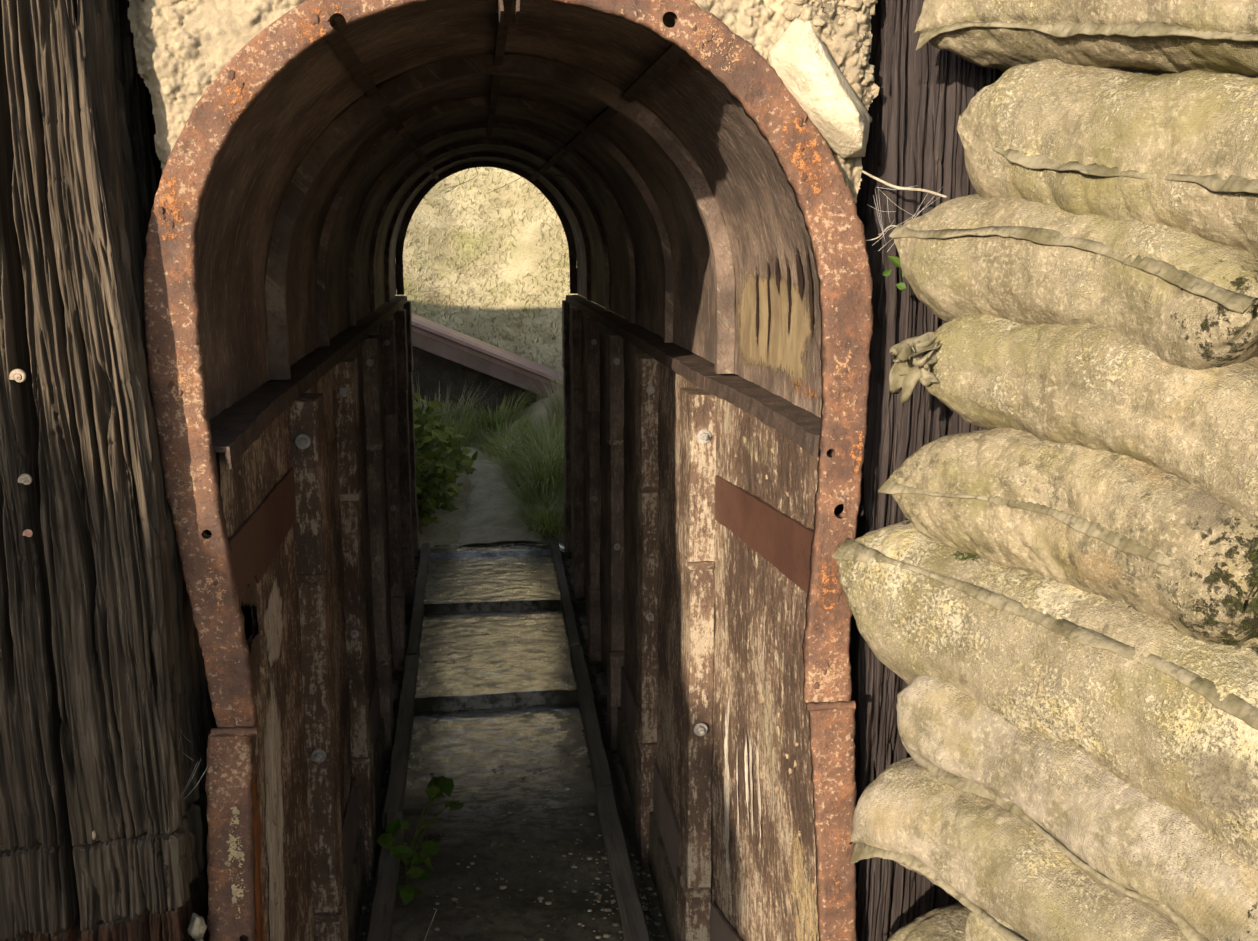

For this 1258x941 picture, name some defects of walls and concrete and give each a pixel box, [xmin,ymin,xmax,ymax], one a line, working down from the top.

corrosion [295,4,349,44]
corrosion [215,70,255,125]
corrosion [779,111,830,200]
corrosion [154,163,187,242]
corrosion [850,427,864,473]
corrosion [821,558,841,620]
corrosion [251,776,265,941]